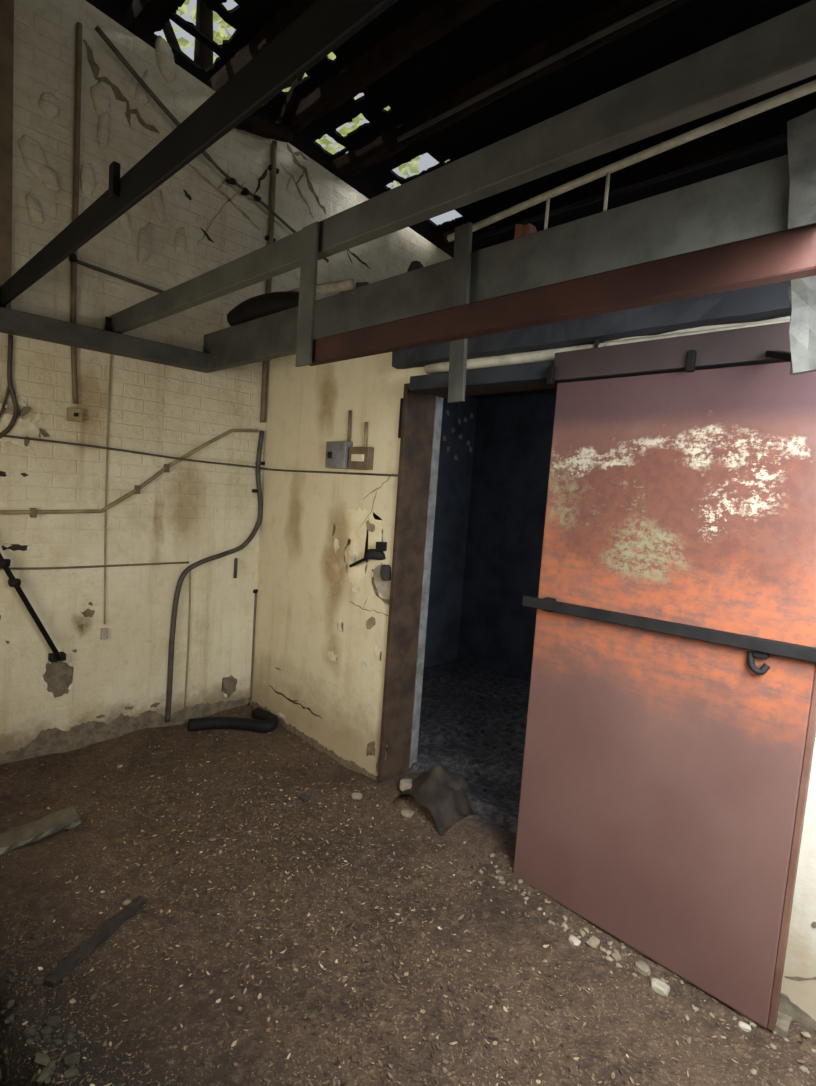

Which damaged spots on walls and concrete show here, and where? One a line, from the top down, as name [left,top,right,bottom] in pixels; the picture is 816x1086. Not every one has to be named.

crack [83,40,160,134]
crack [183,143,327,245]
crack [346,249,371,269]
spalling [42,649,77,698]
spalling [0,675,388,781]
spalling [778,993,816,1037]